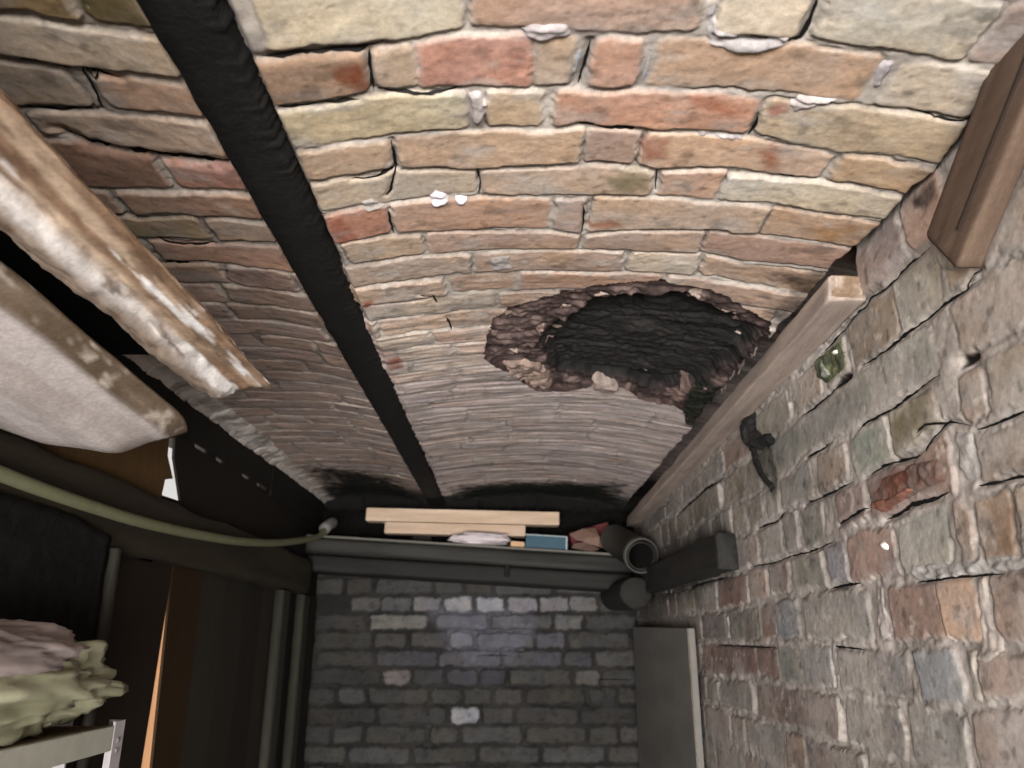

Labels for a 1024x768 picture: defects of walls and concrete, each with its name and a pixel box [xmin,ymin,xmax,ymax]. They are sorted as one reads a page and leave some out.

crack [578,41,590,82]
crack [352,139,397,233]
spalling [483,279,772,428]
damp [312,468,410,497]
damp [459,482,626,502]
crack [679,478,723,514]
crack [752,411,1024,567]